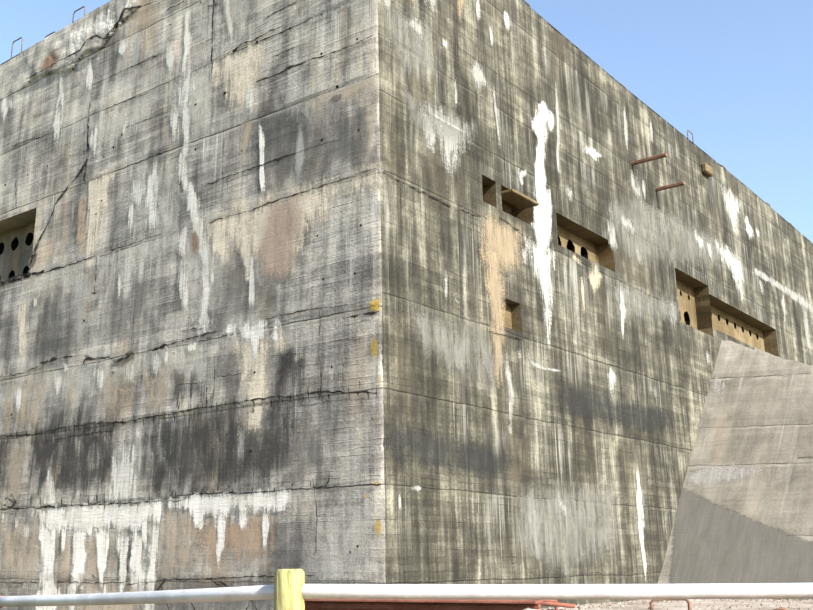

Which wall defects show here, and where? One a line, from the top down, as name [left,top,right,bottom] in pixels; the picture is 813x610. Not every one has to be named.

damp [67,0,136,55]
crack [26,1,184,79]
damp [224,0,244,36]
crack [207,0,372,83]
crack [1,52,163,294]
damp [0,9,383,431]
damp [518,89,560,344]
damp [32,429,367,595]
damp [669,466,813,584]